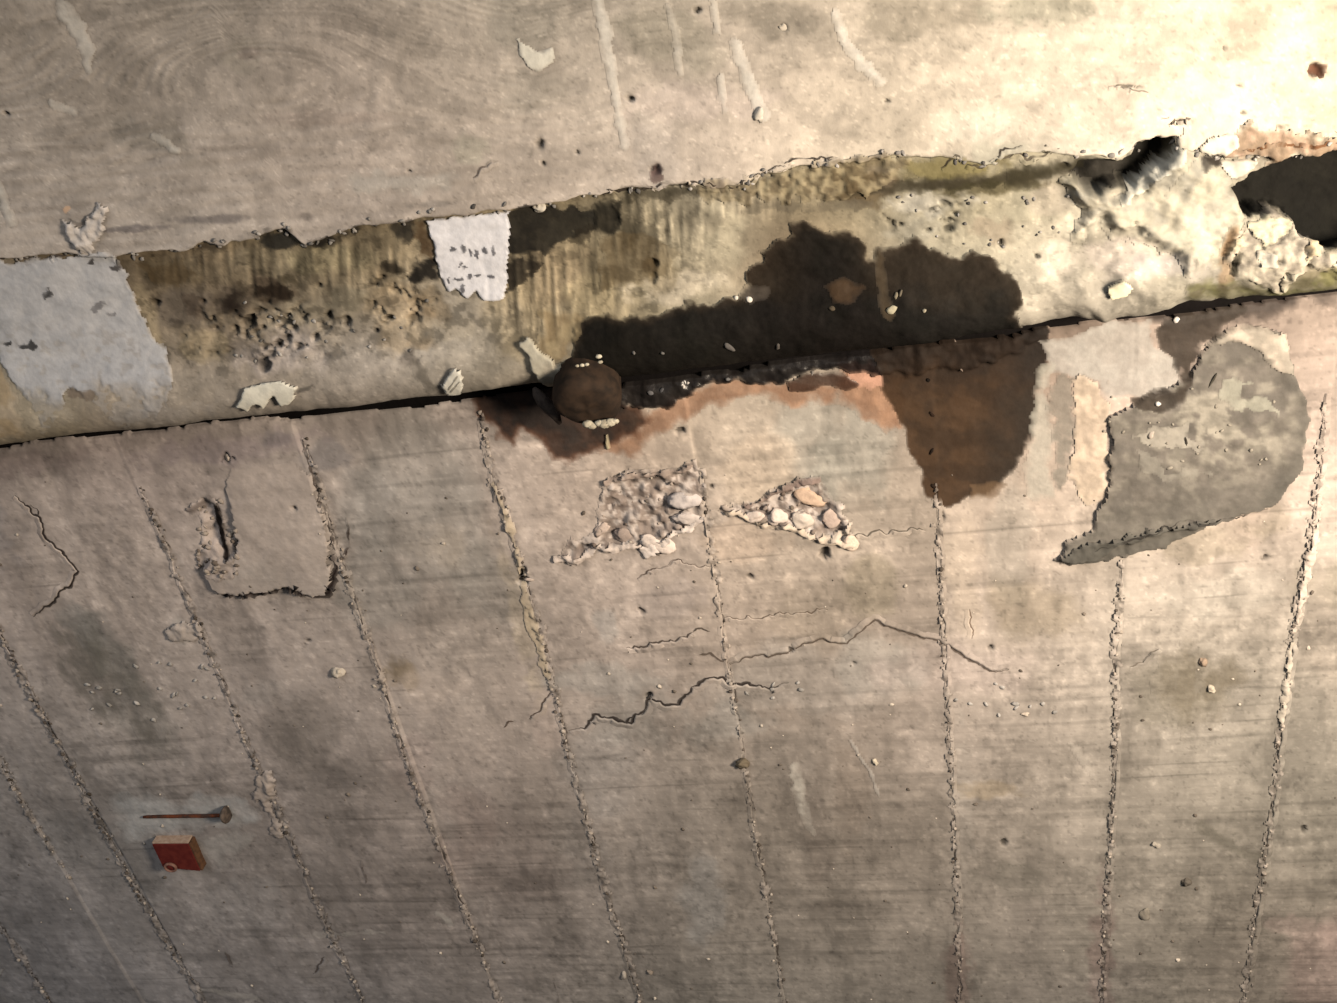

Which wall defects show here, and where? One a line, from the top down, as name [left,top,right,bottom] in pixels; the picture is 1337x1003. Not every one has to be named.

peeling [0,202,174,440]
water stain [248,222,365,252]
water stain [368,217,441,308]
water stain [582,350,880,429]
corrosion [470,326,1051,509]
spalling [1003,136,1177,191]
water stain [1020,200,1337,506]
spalling [1200,119,1337,249]
crack [12,495,79,617]
flaking render [184,443,350,600]
spalling [553,459,862,566]
crack [504,608,1012,736]